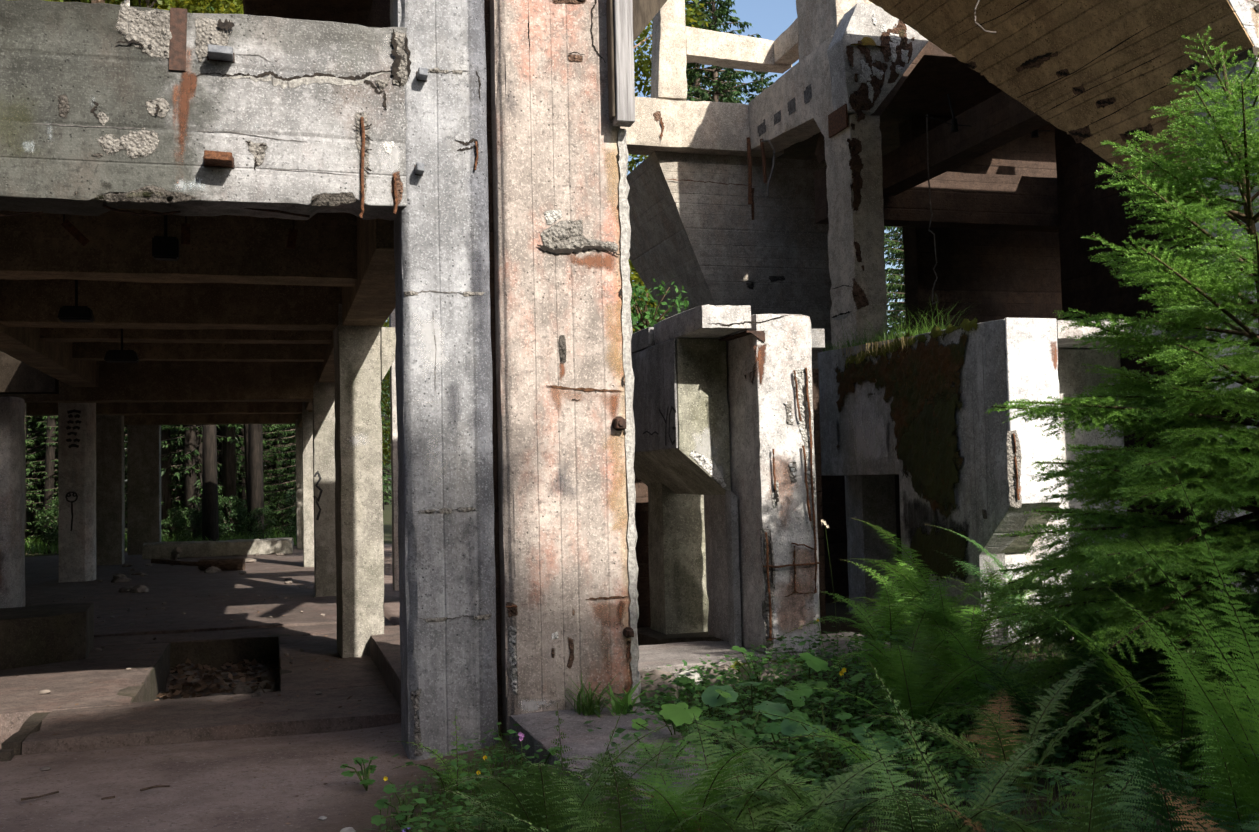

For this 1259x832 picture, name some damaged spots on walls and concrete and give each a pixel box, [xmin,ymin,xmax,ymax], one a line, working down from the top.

spalling [92,97,170,158]
spalling [115,2,172,58]
corrosion [174,72,197,152]
crack [195,54,390,110]
spalling [390,29,412,86]
crack [590,0,605,62]
peeling [846,13,915,211]
spalling [537,128,641,703]